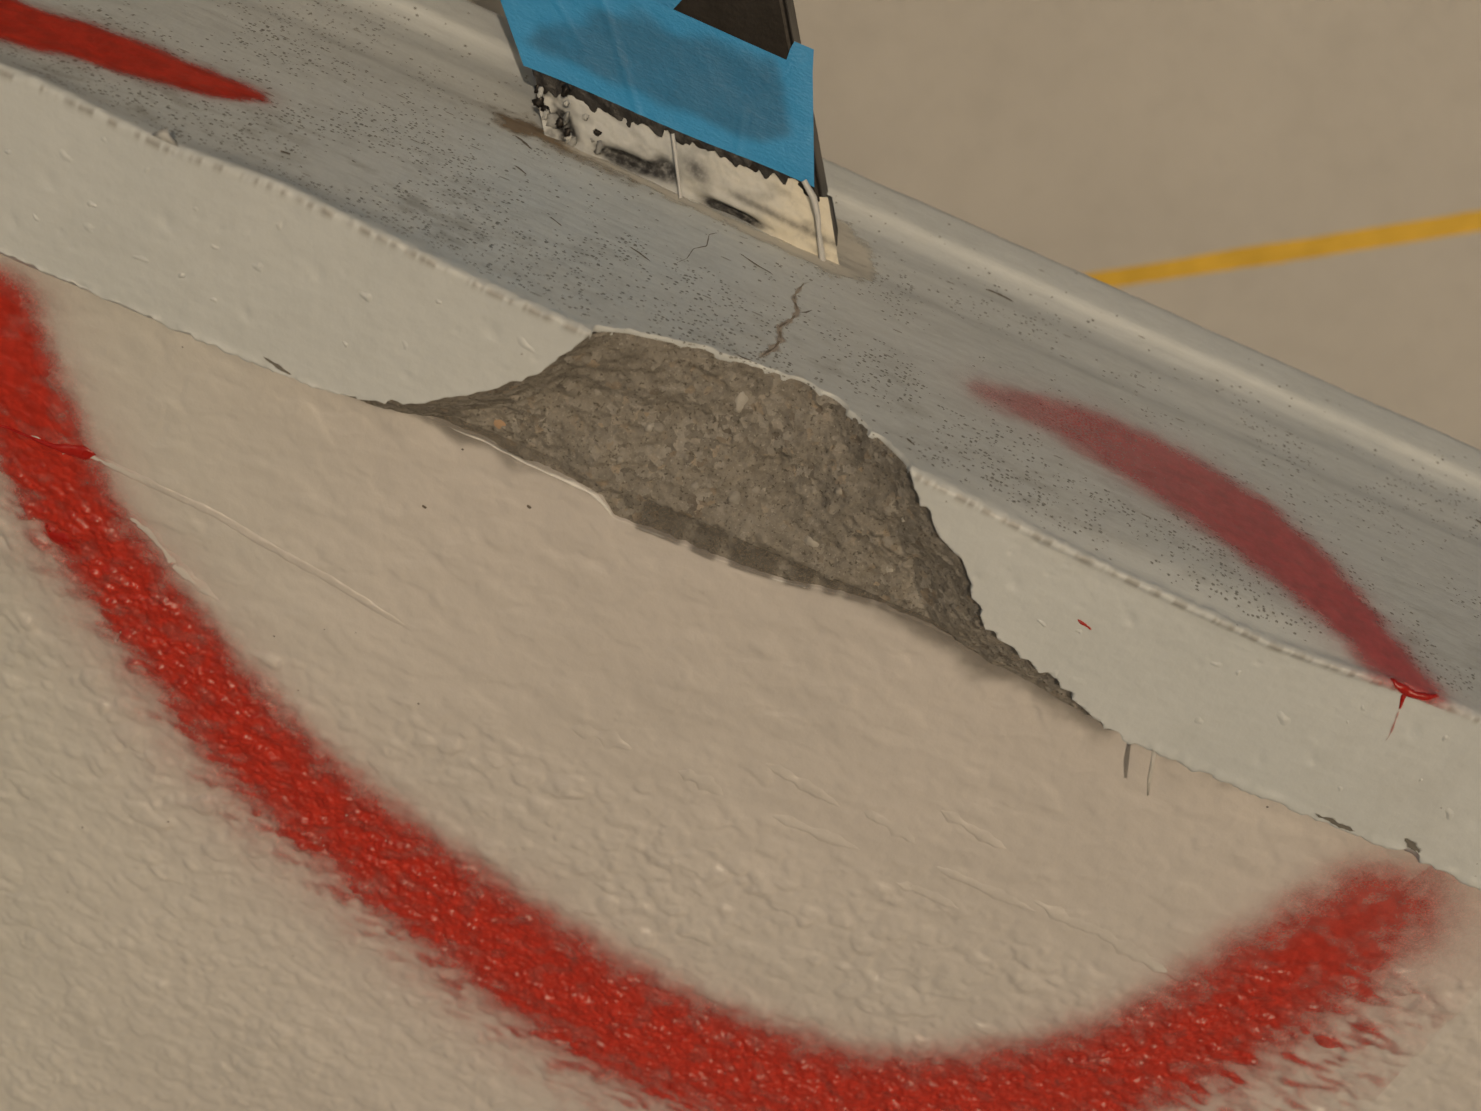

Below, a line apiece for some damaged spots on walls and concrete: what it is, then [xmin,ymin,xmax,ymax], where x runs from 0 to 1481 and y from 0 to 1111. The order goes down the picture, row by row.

crack [734,286,812,361]
spalling [348,332,1102,723]